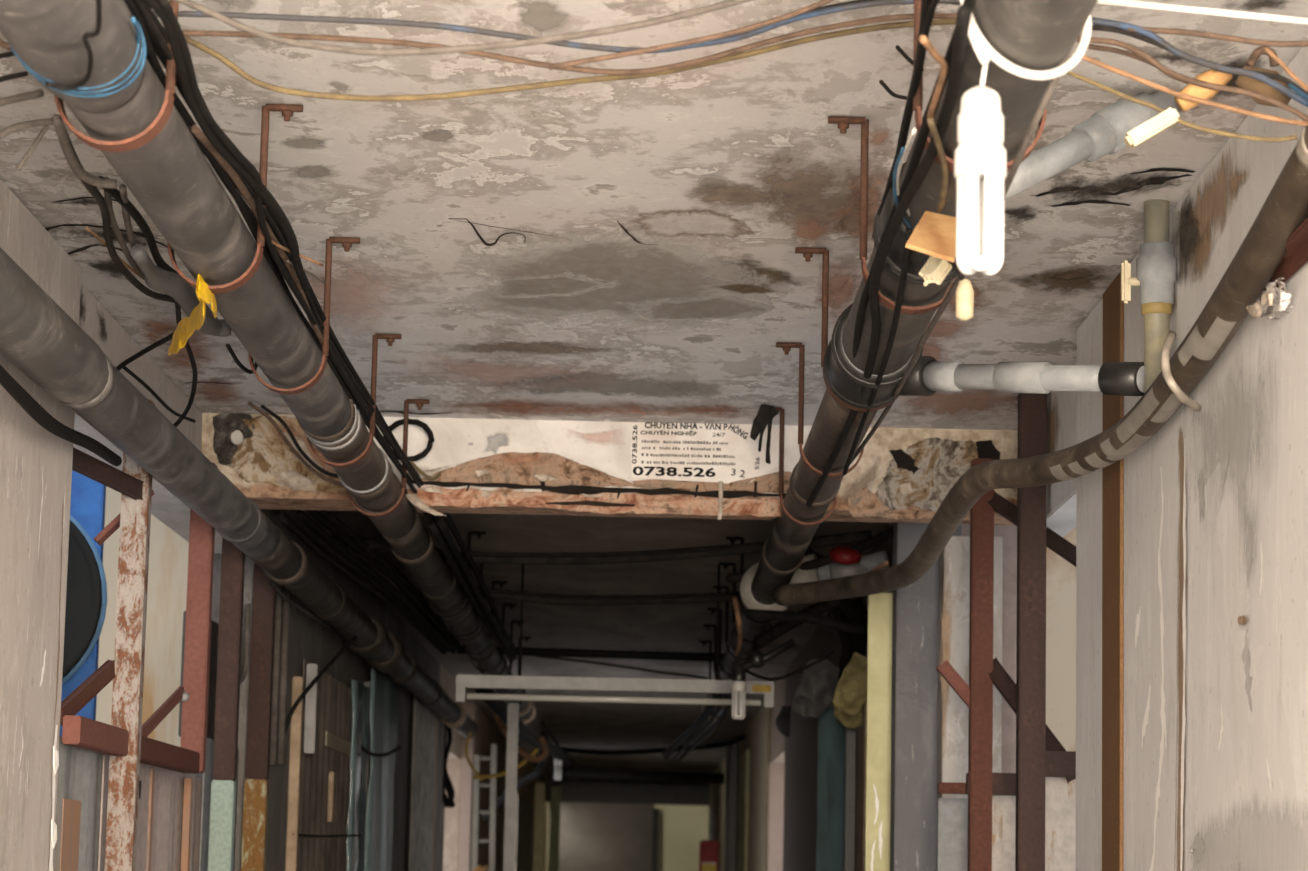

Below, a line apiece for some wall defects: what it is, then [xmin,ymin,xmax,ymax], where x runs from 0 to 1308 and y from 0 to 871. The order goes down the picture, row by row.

damp [694,155,860,234]
damp [1004,208,1035,221]
damp [1050,174,1168,200]
damp [1176,199,1199,280]
damp [465,231,789,331]
damp [464,343,608,354]
spalling [228,414,347,493]
spalling [406,452,791,520]
spalling [847,437,1001,520]